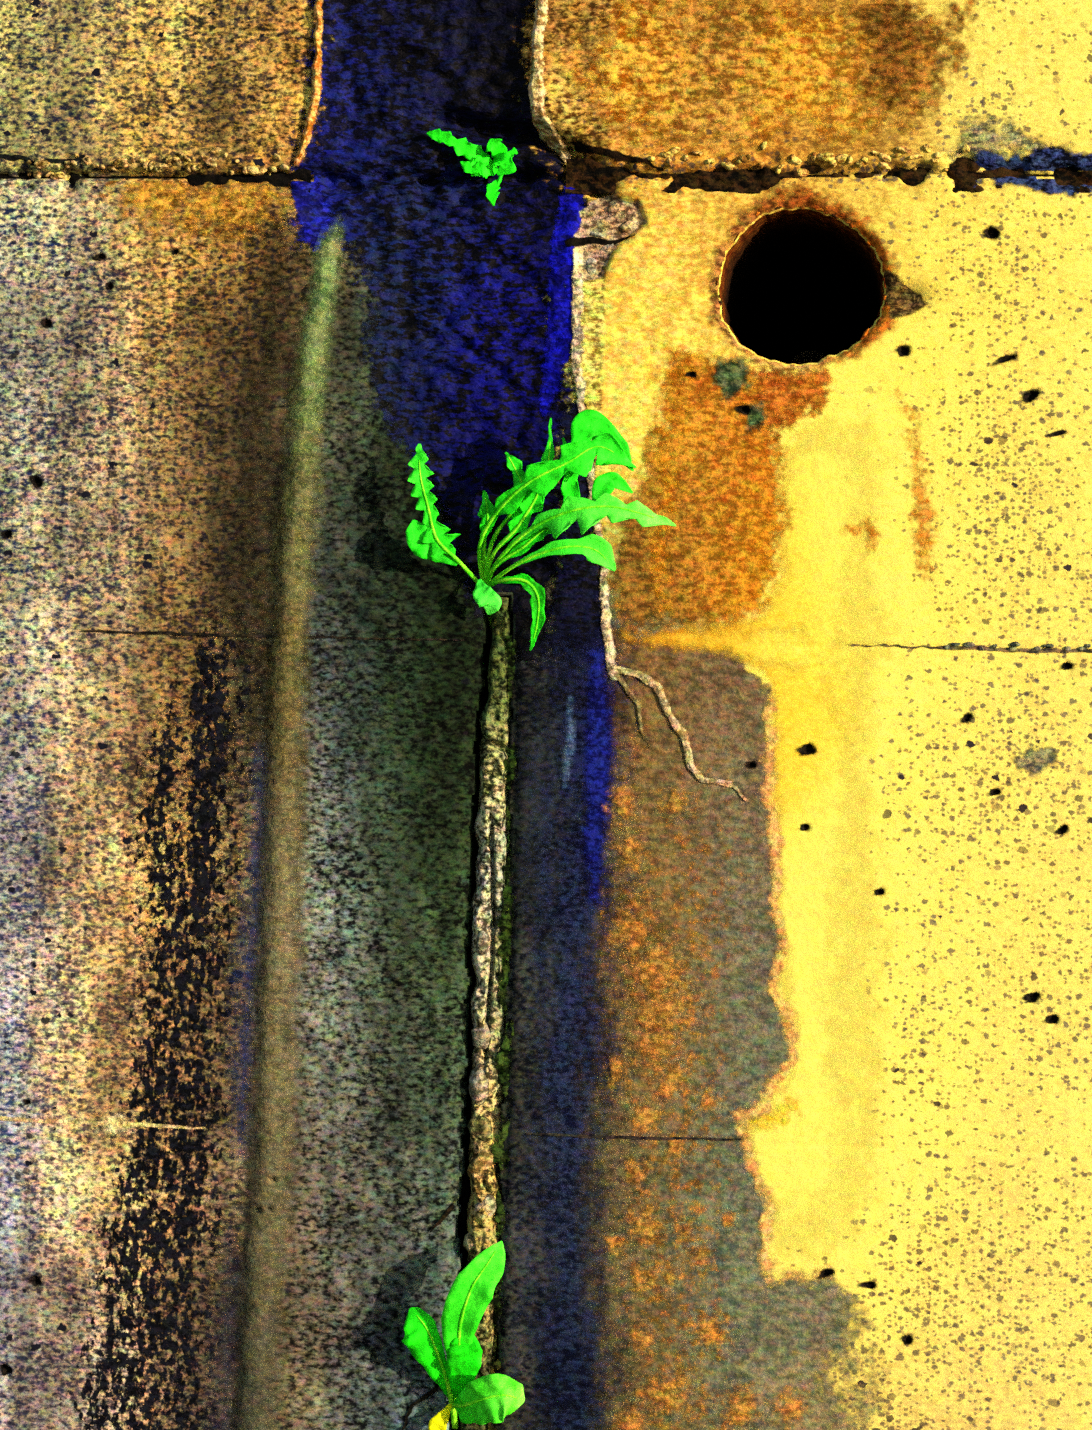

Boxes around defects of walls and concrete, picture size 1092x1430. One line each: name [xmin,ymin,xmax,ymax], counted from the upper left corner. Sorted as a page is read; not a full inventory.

rust [569,0,975,155]
rust [607,185,897,638]
rust [905,405,935,571]
crack [609,666,749,801]
spalling [798,744,817,756]
damp [0,273,290,1430]
crack [81,597,511,1272]
peeling [605,786,760,1430]
spalling [818,1268,835,1279]
crack [401,1383,460,1430]
peeling [775,1386,806,1430]